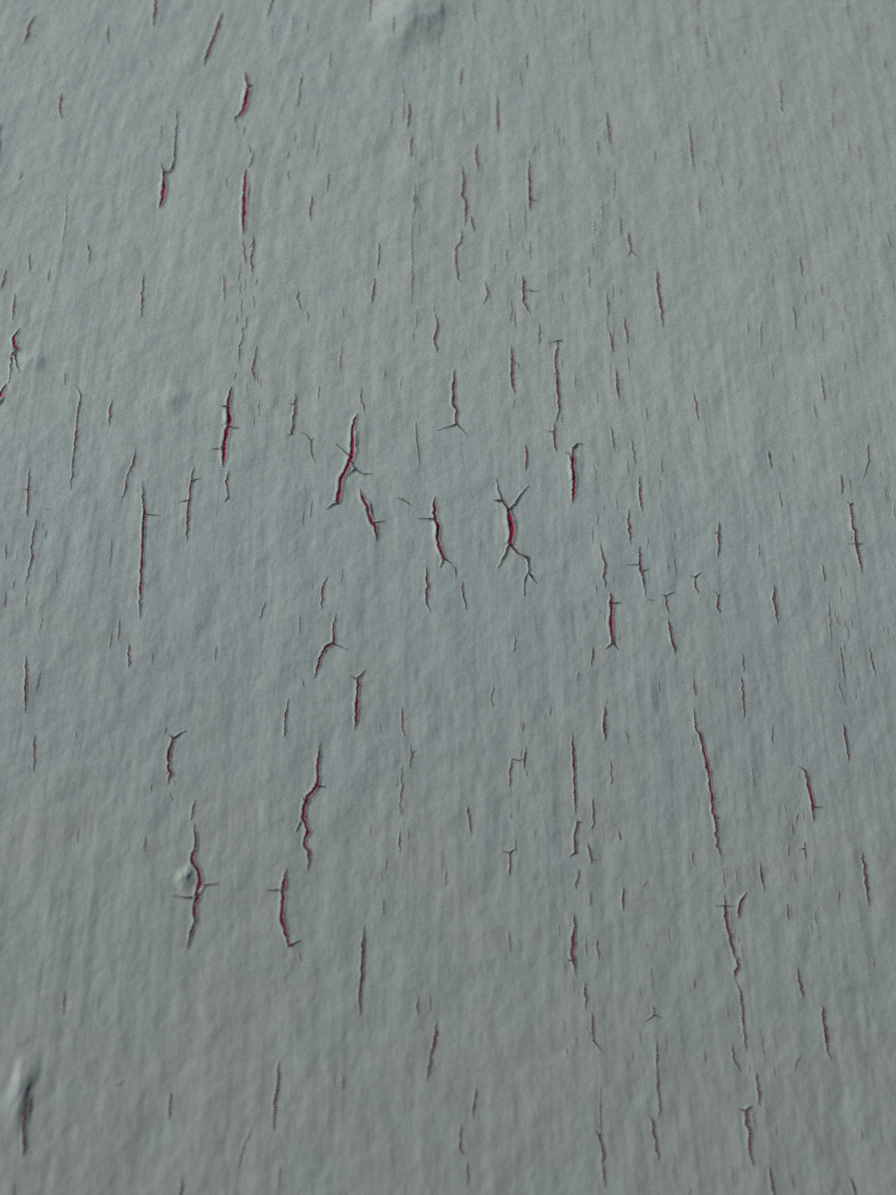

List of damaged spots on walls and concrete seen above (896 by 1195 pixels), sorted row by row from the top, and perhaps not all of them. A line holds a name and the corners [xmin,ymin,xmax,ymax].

crack [202,11,224,67]
crack [3,373,113,773]
crack [287,241,467,612]
crack [389,0,722,682]
crack [742,79,895,418]
crack [821,432,896,761]
crack [150,727,218,950]
crack [236,1059,281,1169]
crack [267,741,326,963]
crack [283,568,416,1016]
crack [415,995,440,1082]
crack [690,653,870,1195]